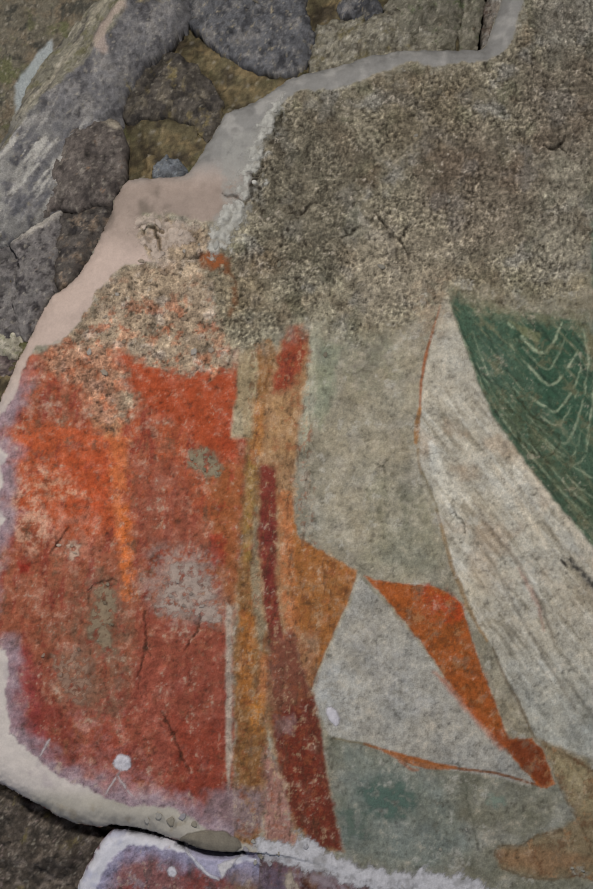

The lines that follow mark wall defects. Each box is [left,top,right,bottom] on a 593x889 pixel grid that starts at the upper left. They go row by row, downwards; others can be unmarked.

spalling [44,0,593,431]
crack [107,812,280,867]